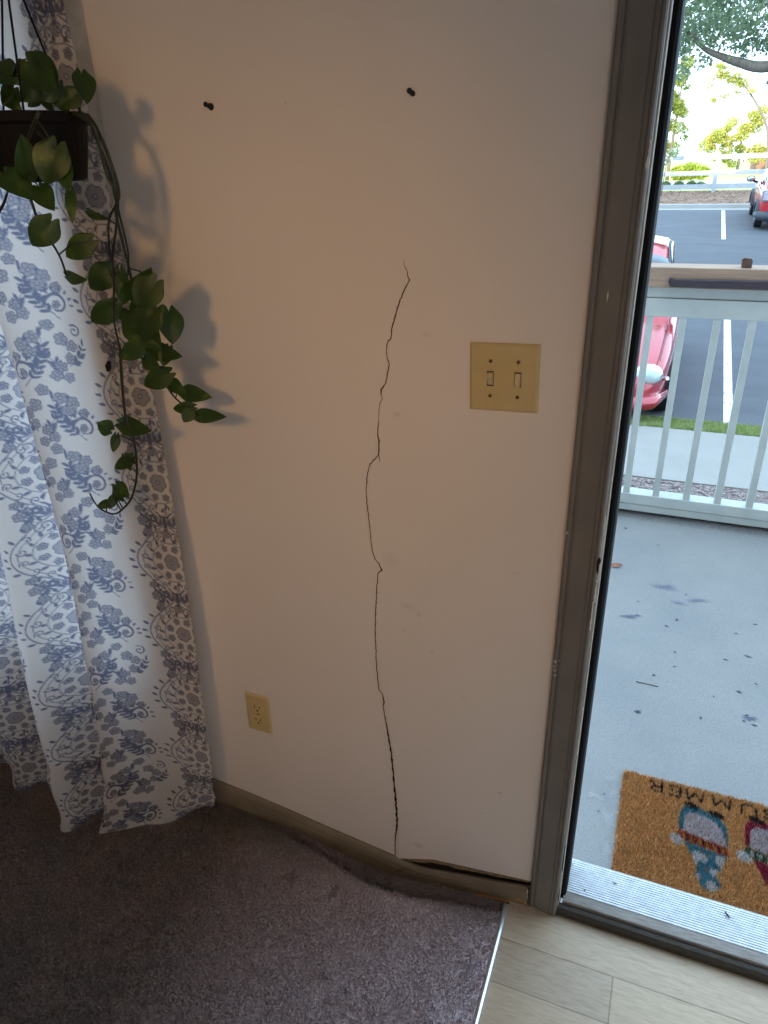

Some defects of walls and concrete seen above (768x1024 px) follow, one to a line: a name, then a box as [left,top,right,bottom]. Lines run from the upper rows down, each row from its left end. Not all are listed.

crack [366,265,411,872]